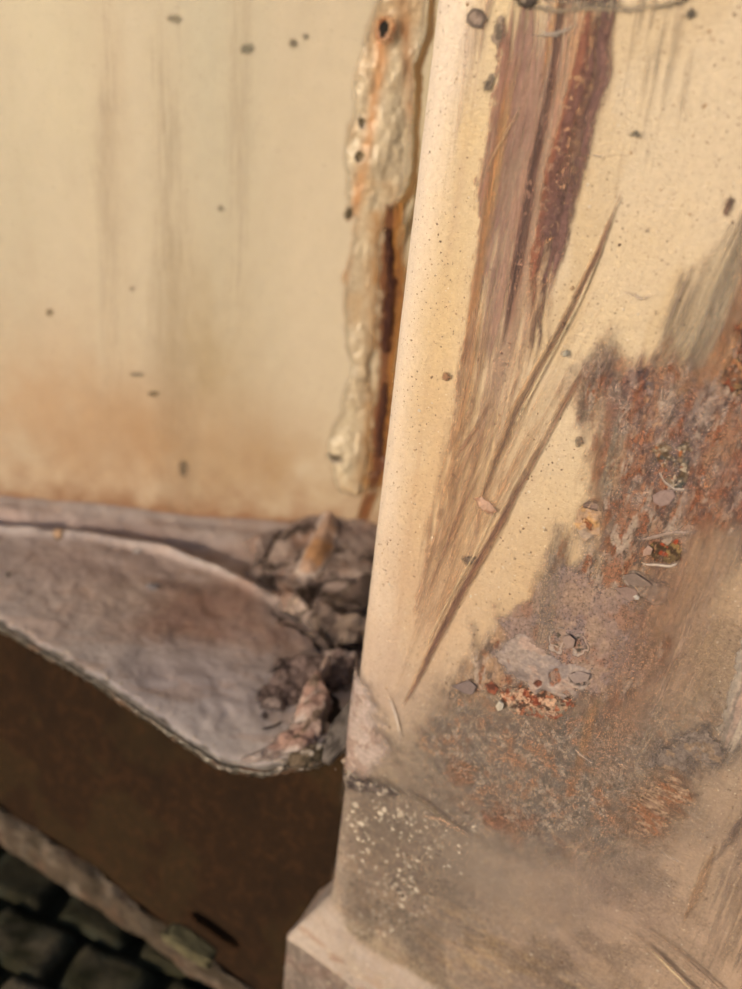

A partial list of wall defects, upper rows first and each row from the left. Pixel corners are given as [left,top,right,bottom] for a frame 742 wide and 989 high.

rust [357,0,436,521]
rust [443,0,616,495]
peeling [256,648,387,775]
efflorescence [339,798,484,939]
rust [422,322,742,862]